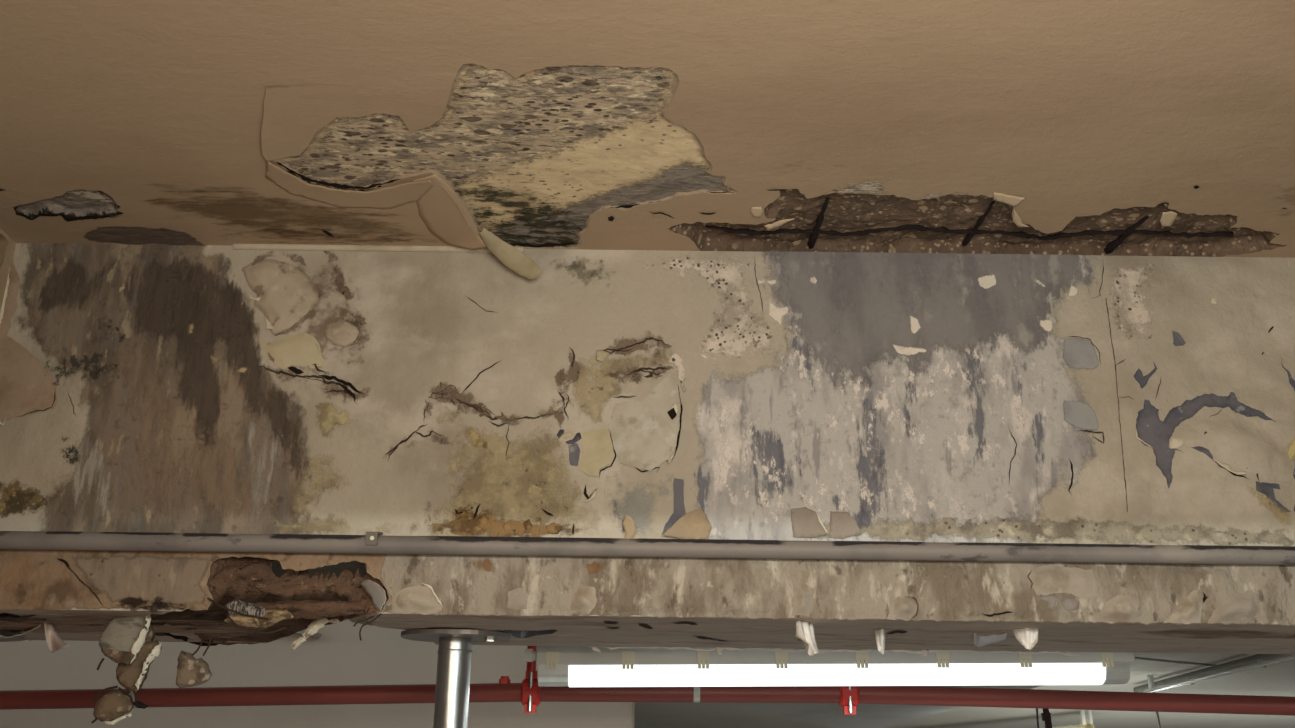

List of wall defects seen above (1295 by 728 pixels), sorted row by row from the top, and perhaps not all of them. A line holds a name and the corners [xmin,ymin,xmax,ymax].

spalling [15,189,204,246]
leakage [148,190,403,243]
peeling [261,63,738,280]
peeling [0,234,76,425]
leakage [0,243,379,539]
peeling [254,333,328,370]
crack [382,336,673,460]
peeling [568,178,1295,546]
peeling [0,549,1295,657]